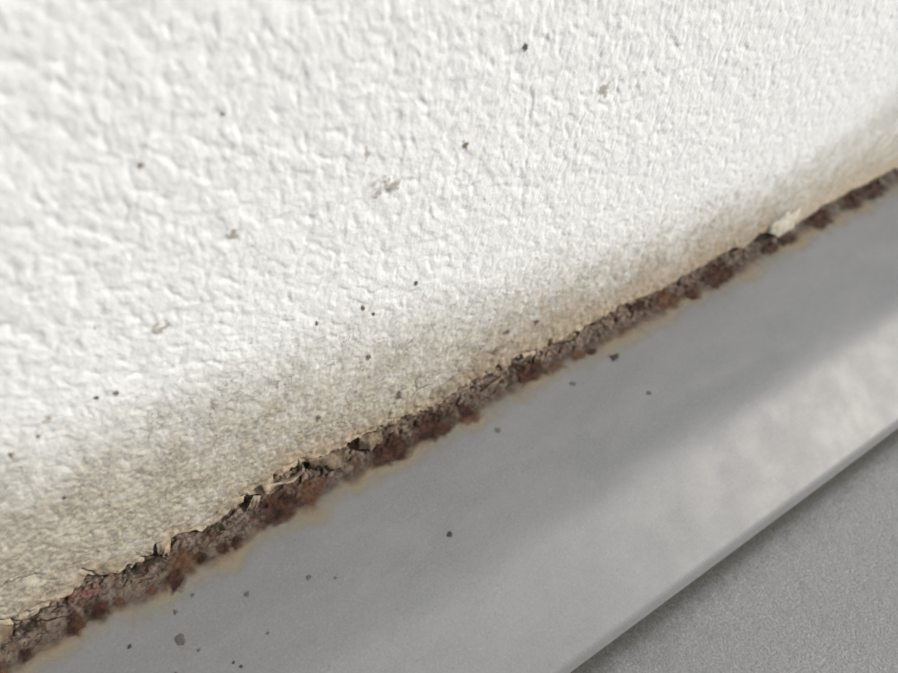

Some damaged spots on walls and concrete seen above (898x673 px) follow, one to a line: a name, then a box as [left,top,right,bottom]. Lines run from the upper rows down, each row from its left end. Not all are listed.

peeling [156,540,171,556]
rust [0,160,898,673]